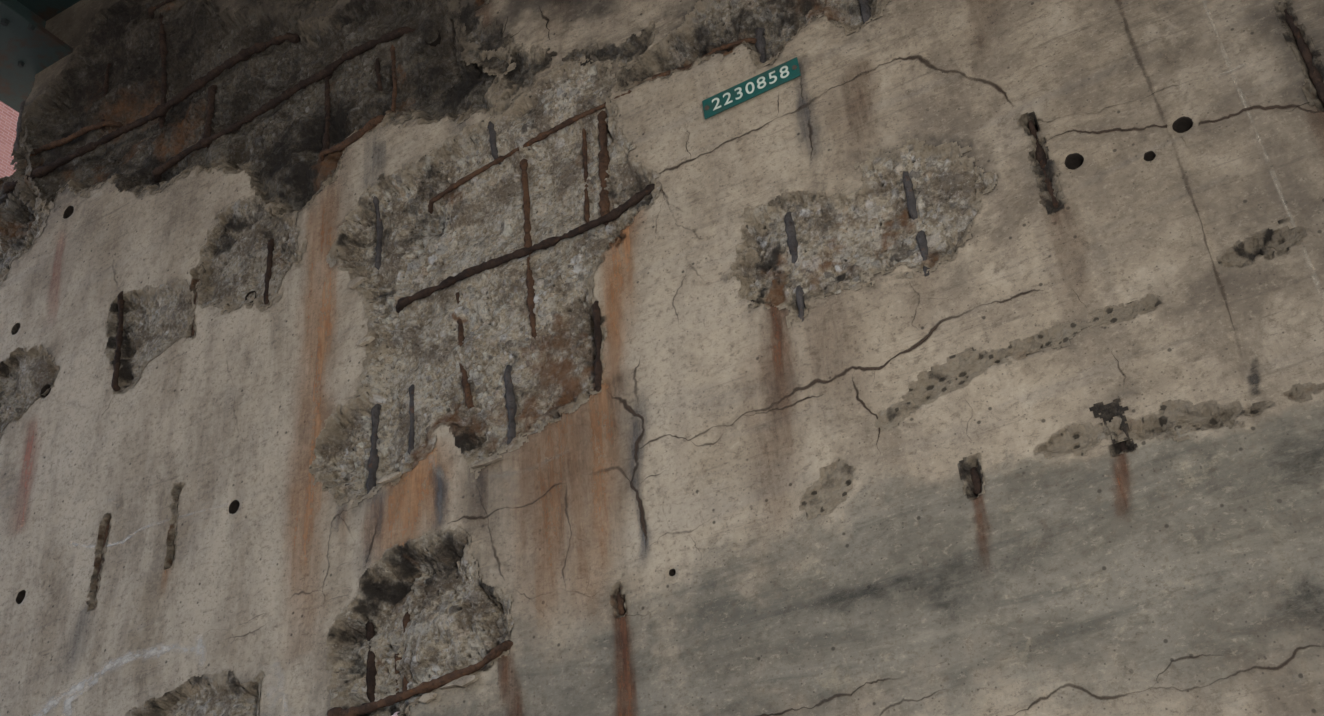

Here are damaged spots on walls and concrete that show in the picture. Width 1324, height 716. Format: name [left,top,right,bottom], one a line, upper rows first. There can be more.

spalling [0,0,892,508]
corrosion [770,305,785,380]
spalling [727,138,998,328]
crack [992,290,1038,303]
crack [608,315,961,547]
spalling [124,670,264,716]
spalling [325,525,515,716]
corrosion [615,609,635,716]
crack [760,679,934,716]
crack [1008,645,1314,716]